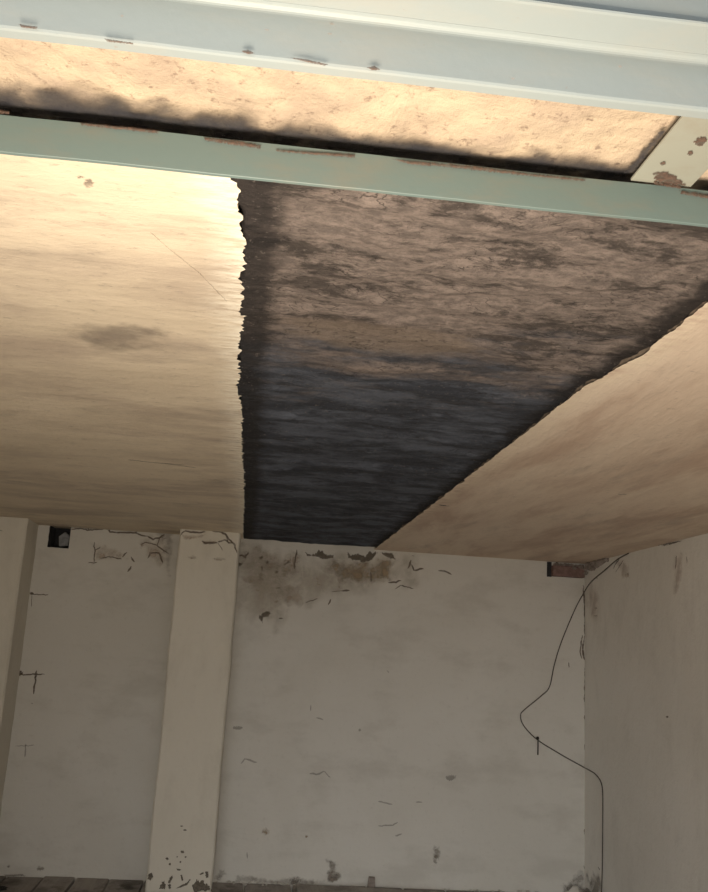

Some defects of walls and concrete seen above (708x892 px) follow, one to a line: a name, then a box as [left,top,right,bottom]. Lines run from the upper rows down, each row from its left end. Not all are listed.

corrosion [81,123,158,133]
corrosion [204,137,261,149]
leakage [0,91,665,184]
corrosion [687,137,708,156]
corrosion [395,159,585,181]
corrosion [653,162,708,198]
crack [71,528,167,572]
flaking render [305,550,333,559]
flaking render [348,551,395,562]
flaking render [147,851,212,892]